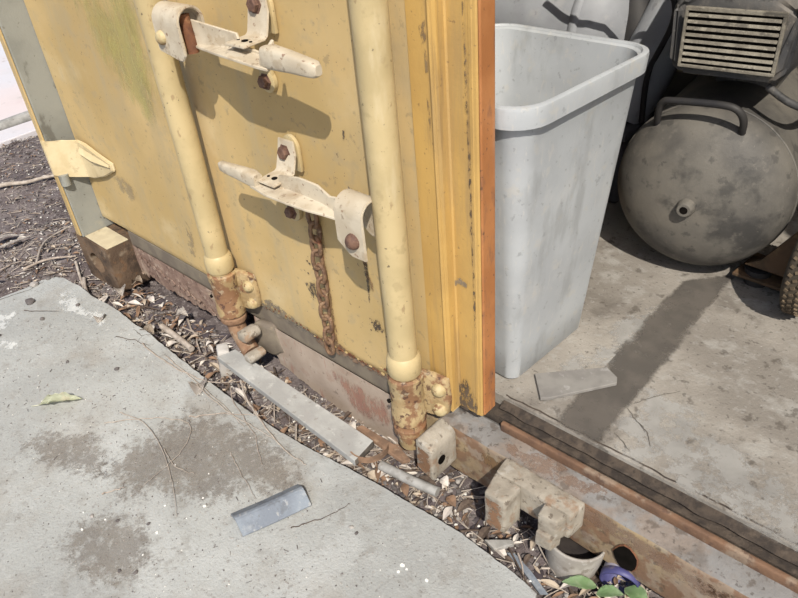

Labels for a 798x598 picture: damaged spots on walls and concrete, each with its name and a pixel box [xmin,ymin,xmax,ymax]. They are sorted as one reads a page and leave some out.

rust [133,245,220,320]
leakage [558,276,733,441]
rust [481,454,501,471]
rust [485,498,501,531]